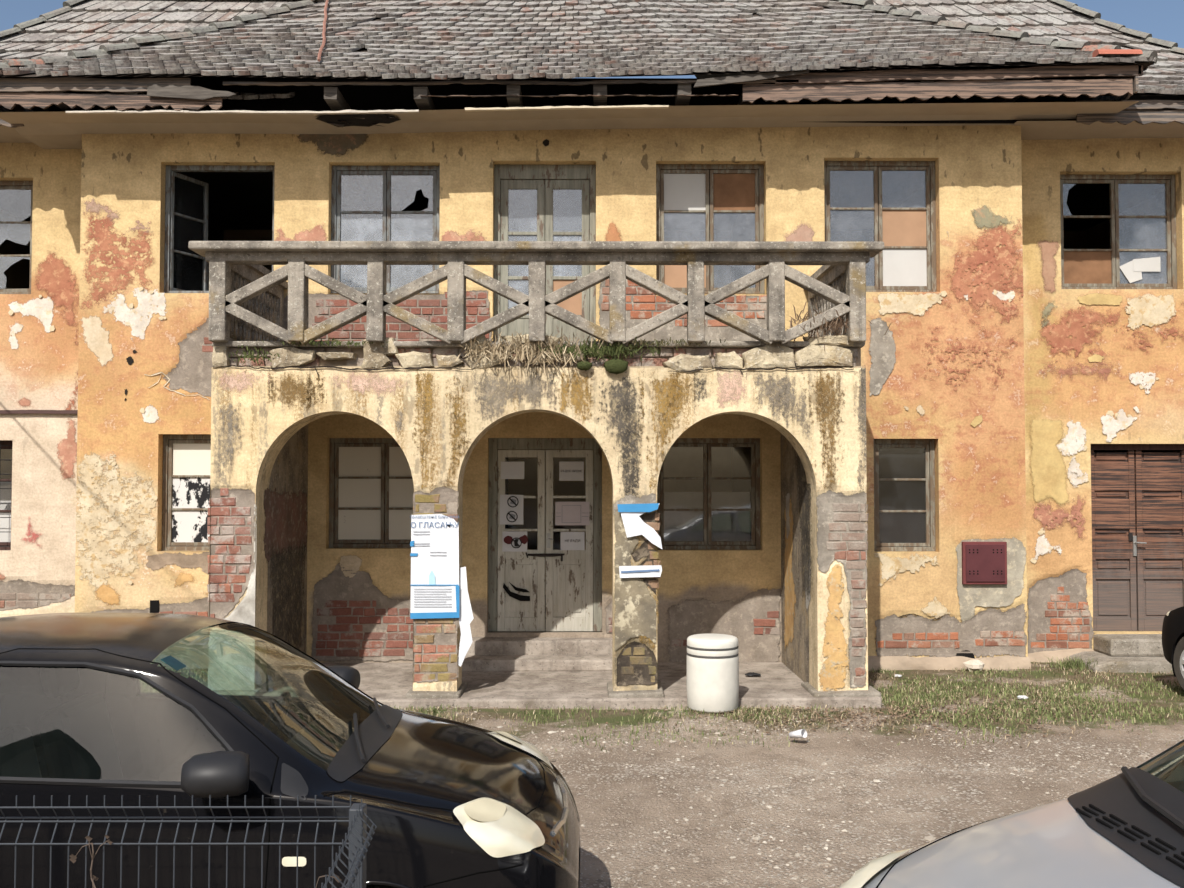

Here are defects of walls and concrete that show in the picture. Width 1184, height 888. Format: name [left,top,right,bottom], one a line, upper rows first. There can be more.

peeling [8,198,167,367]
spalling [163,205,1024,397]
peeling [1039,240,1184,379]
damp [212,403,243,472]
damp [446,369,557,473]
damp [586,375,648,497]
damp [694,373,706,400]
damp [746,373,832,475]
peeling [0,372,308,690]
flaking render [311,563,413,662]
flaking render [614,492,811,686]
spalling [875,569,1094,657]